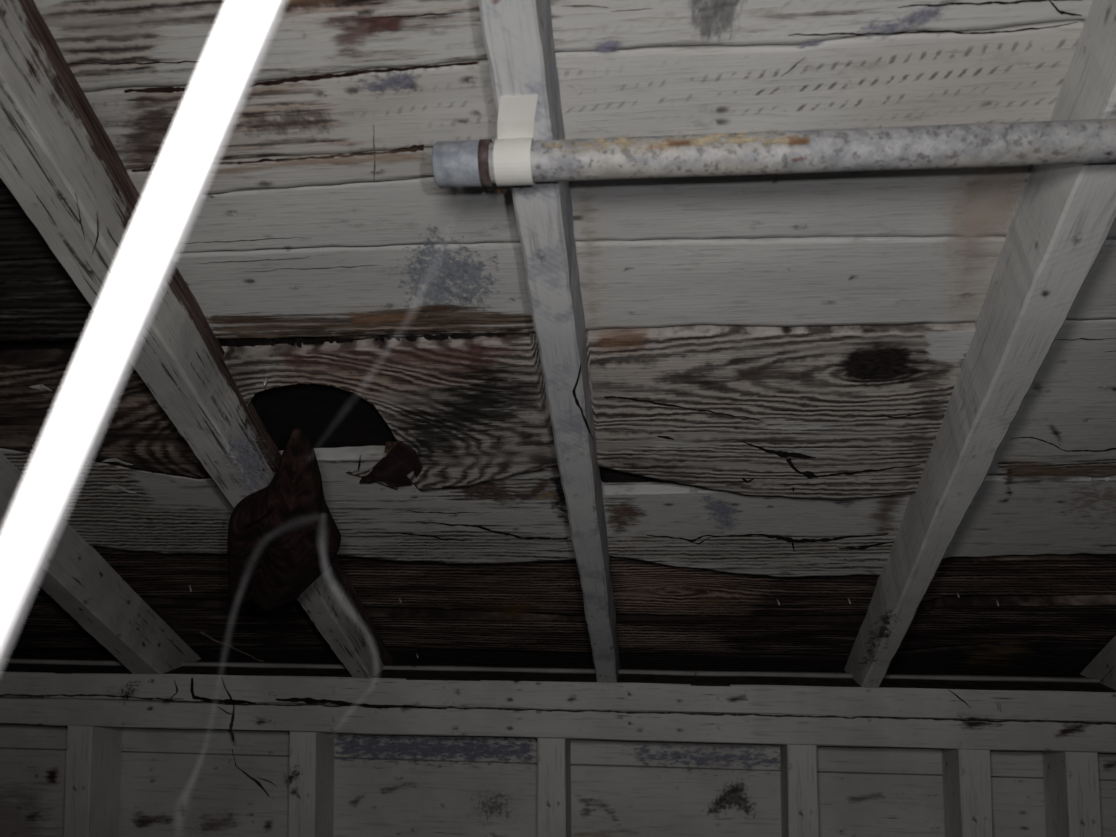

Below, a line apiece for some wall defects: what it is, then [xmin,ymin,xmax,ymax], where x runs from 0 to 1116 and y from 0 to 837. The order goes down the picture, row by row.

crack [782,0,1083,76]
rust [546,128,809,152]
crack [858,398,946,418]
crack [572,364,920,499]
crack [1012,437,1116,452]
crack [647,533,895,552]
crack [0,677,1116,796]